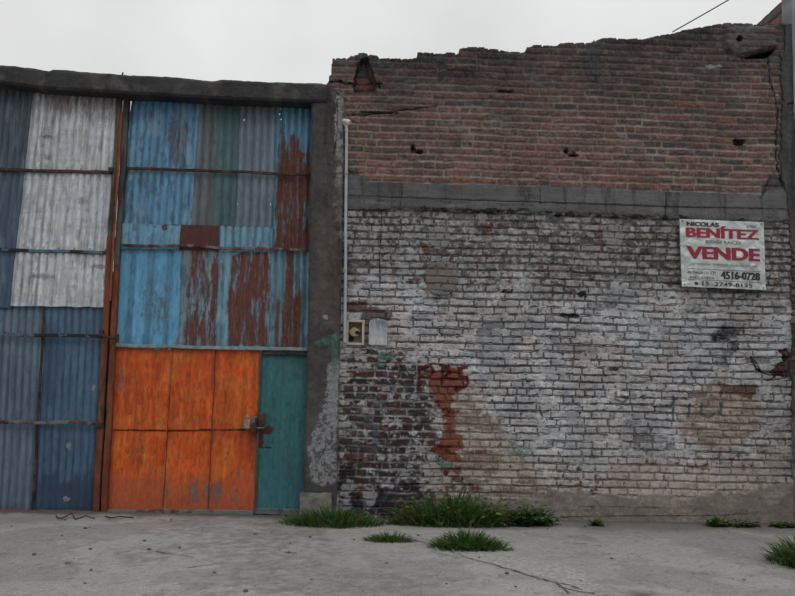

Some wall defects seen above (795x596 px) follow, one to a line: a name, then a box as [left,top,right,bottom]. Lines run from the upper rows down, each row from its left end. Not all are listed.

crack [350,46,795,287]
peeling [308,358,377,488]
flaking render [678,380,766,446]
spalling [768,348,790,378]